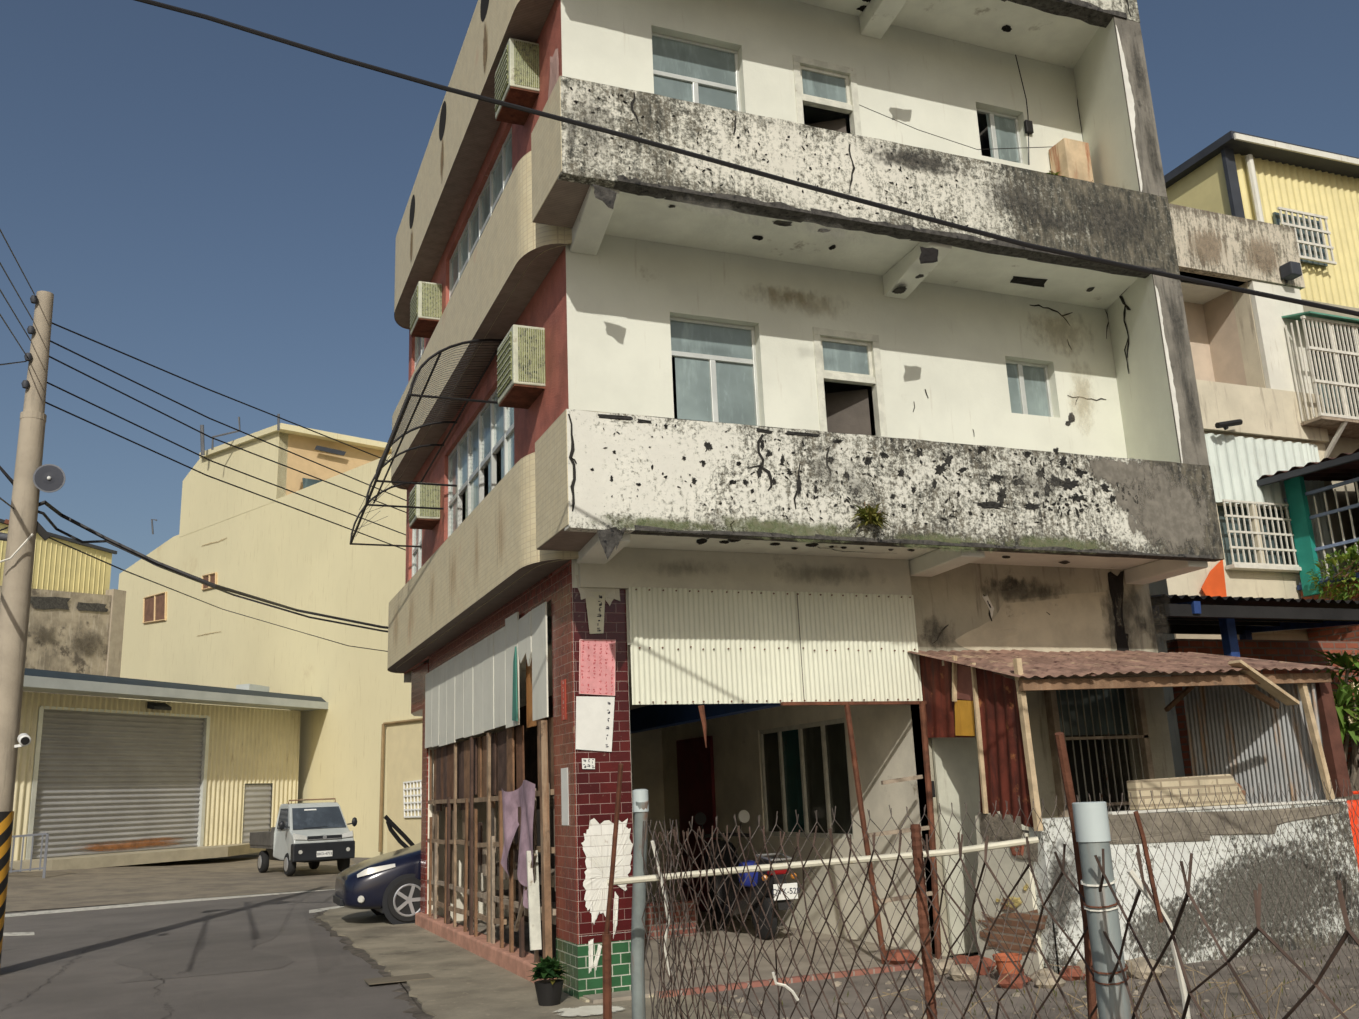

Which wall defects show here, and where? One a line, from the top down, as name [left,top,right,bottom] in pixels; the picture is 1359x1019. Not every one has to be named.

crack [630,92,639,123]
spalling [1001,0,1142,192]
crack [847,144,855,192]
water stain [872,147,962,176]
water stain [1189,230,1222,265]
water stain [1245,239,1278,274]
crack [1030,304,1073,350]
crack [1105,287,1131,373]
crack [568,414,577,511]
crack [748,434,831,509]
spalling [597,428,1211,651]
water stain [985,578,1056,601]